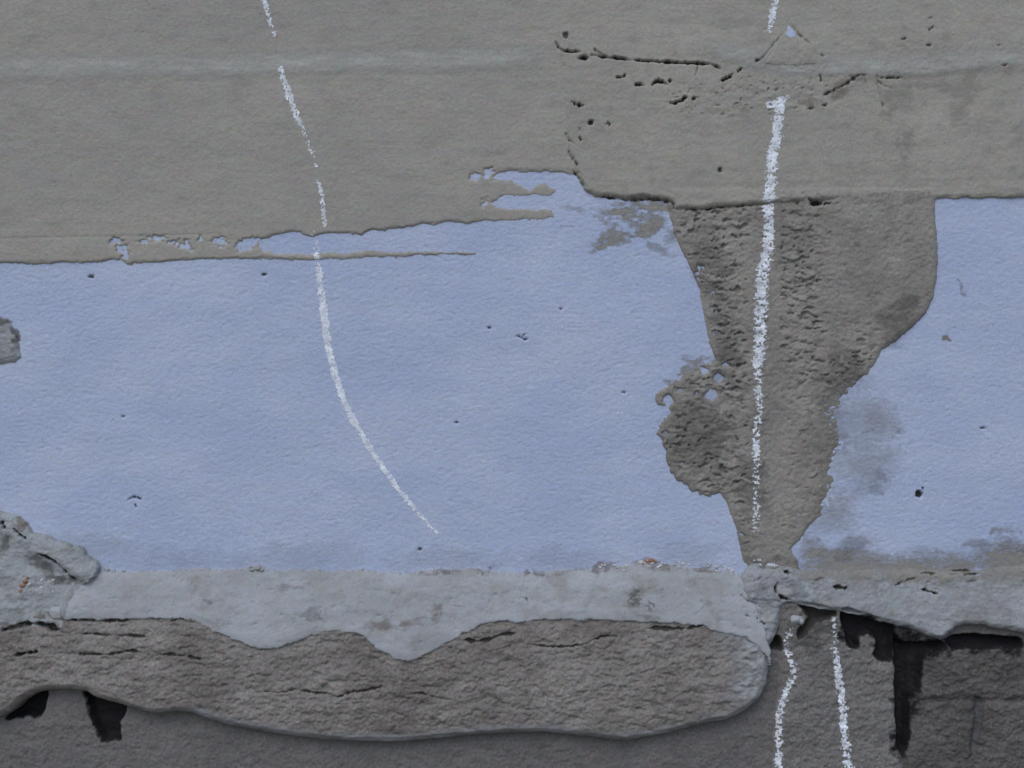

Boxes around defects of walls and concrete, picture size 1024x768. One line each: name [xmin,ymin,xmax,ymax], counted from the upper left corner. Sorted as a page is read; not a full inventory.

crack [557,46,759,105]
crack [809,75,899,110]
crack [651,623,703,631]
crack [4,619,146,656]
crack [466,632,514,643]
crack [540,635,611,648]
crack [164,652,200,660]
crack [266,686,381,697]